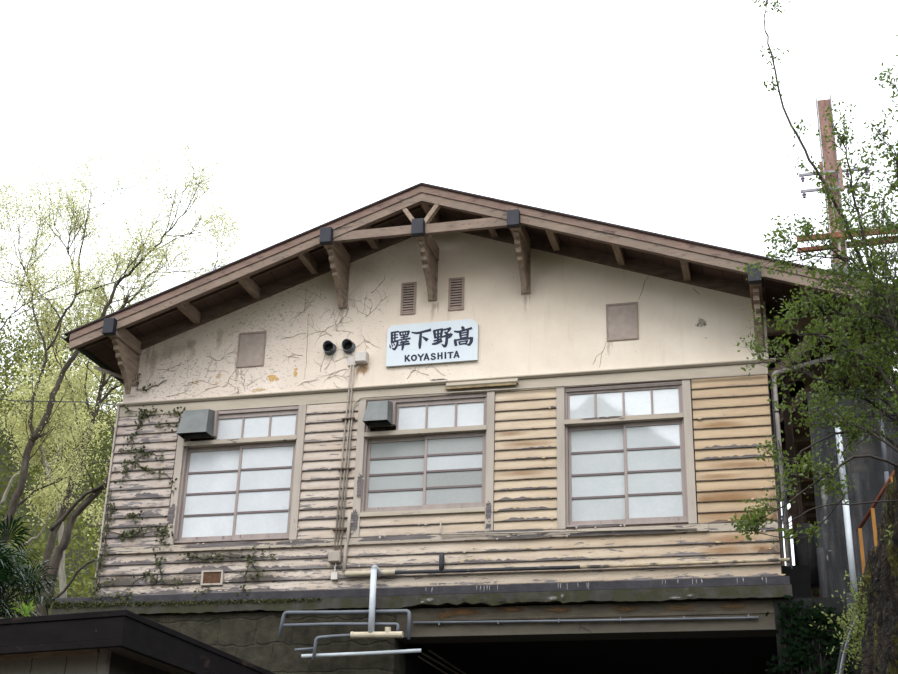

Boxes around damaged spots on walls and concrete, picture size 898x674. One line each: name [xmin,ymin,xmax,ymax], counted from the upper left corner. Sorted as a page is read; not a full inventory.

peeling [506,446,552,469]
peeling [696,444,773,460]
peeling [303,467,343,480]
peeling [97,472,592,597]
peeling [561,519,777,553]